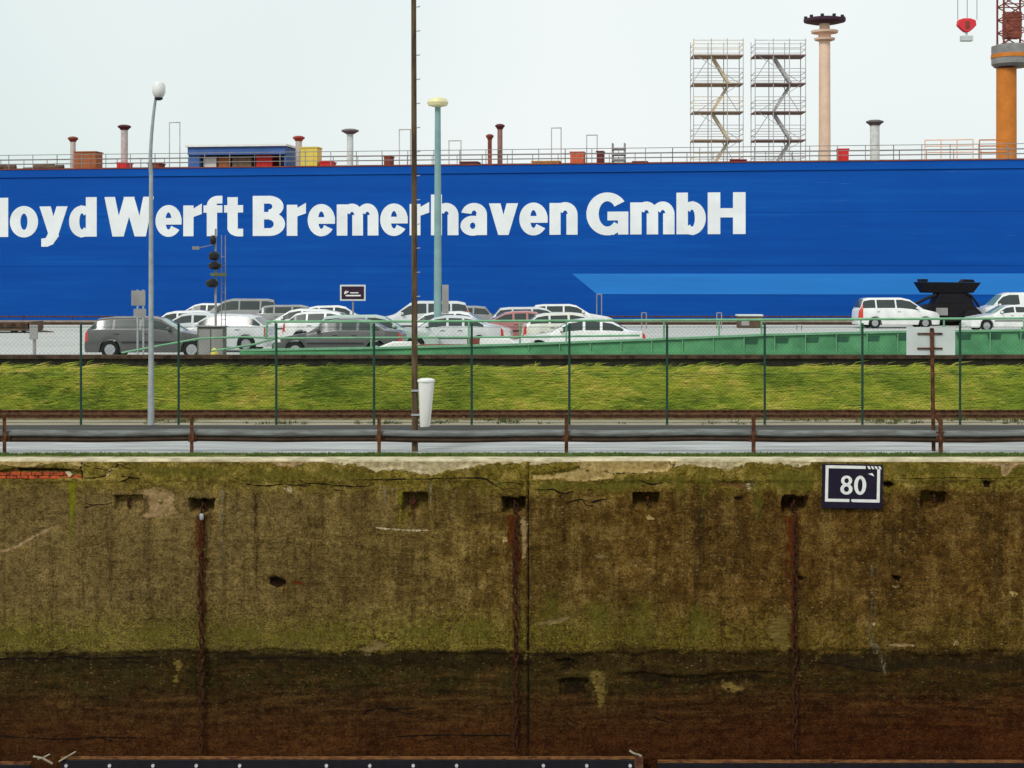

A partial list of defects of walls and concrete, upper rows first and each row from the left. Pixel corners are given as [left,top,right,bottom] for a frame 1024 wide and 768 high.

flaking render [0,461,123,479]
spalling [139,487,178,519]
crack [235,477,605,507]
damp [215,648,507,662]